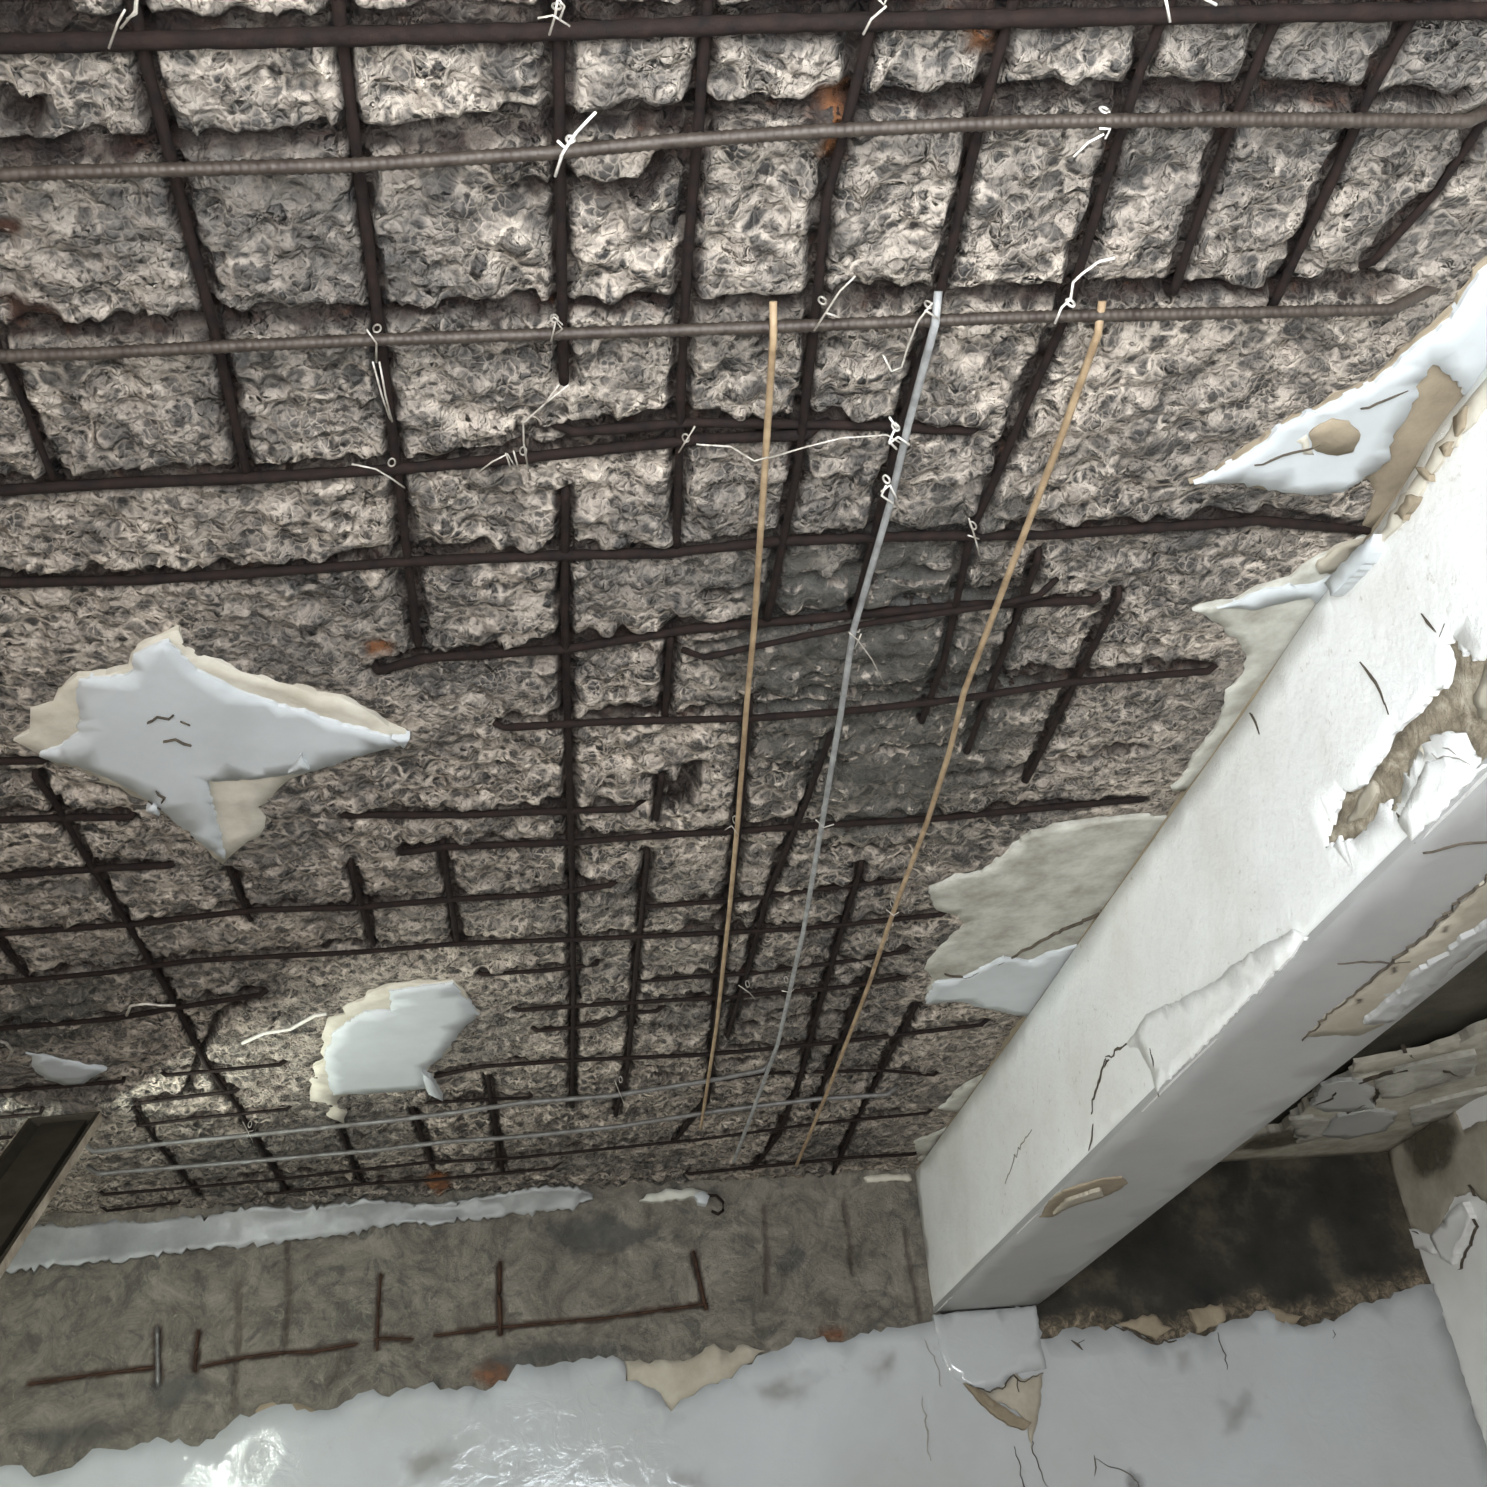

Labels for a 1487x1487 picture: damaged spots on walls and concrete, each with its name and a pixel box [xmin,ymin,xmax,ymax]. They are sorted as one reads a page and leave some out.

spalling [0,0,1487,1175]
spalling [0,788,941,1477]
crack [1088,1043,1159,1151]
spalling [1036,881,1487,1342]
peeling [963,1373,1043,1449]
crack [1014,1417,1048,1487]